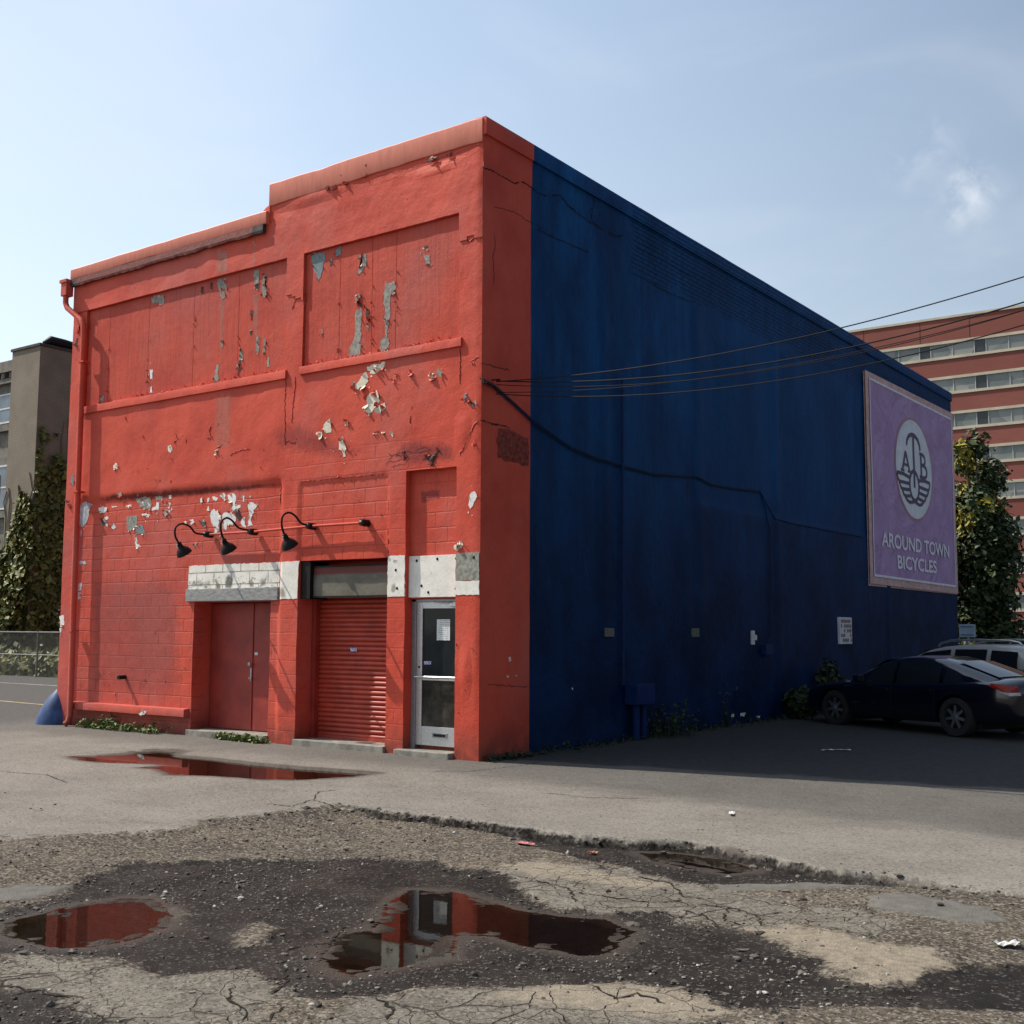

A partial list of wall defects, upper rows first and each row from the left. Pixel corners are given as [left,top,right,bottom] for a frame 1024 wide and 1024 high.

crack [375,144,691,302]
peeling [200,278,227,299]
peeling [254,269,268,298]
peeling [311,245,341,281]
peeling [357,253,367,275]
peeling [99,309,278,404]
peeling [305,272,399,416]
peeling [316,419,356,464]
peeling [64,492,172,549]
peeling [184,493,258,536]